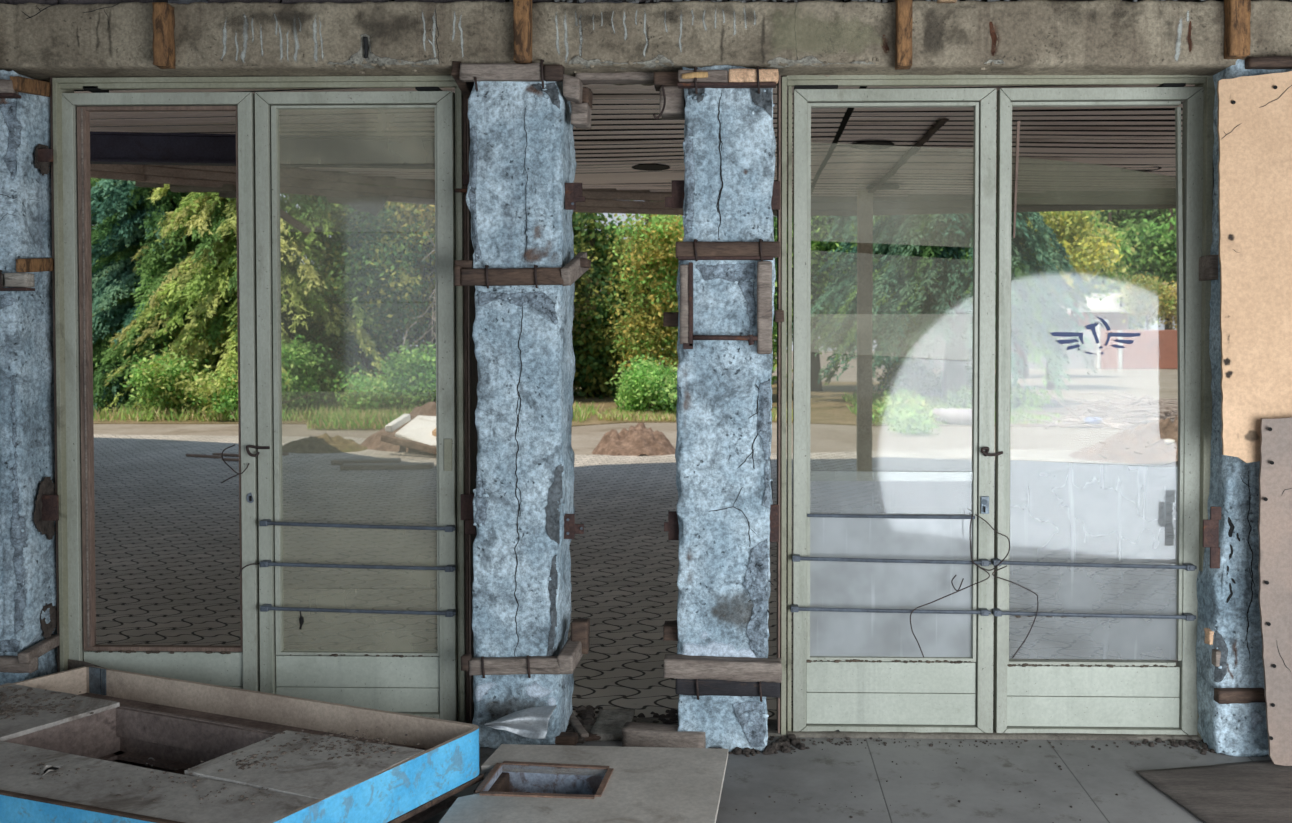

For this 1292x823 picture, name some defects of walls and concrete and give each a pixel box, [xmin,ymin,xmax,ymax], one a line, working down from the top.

leakage [222,12,324,62]
crack [522,106,530,258]
crack [715,93,723,237]
crack [709,379,770,547]
spalling [1214,630,1228,683]